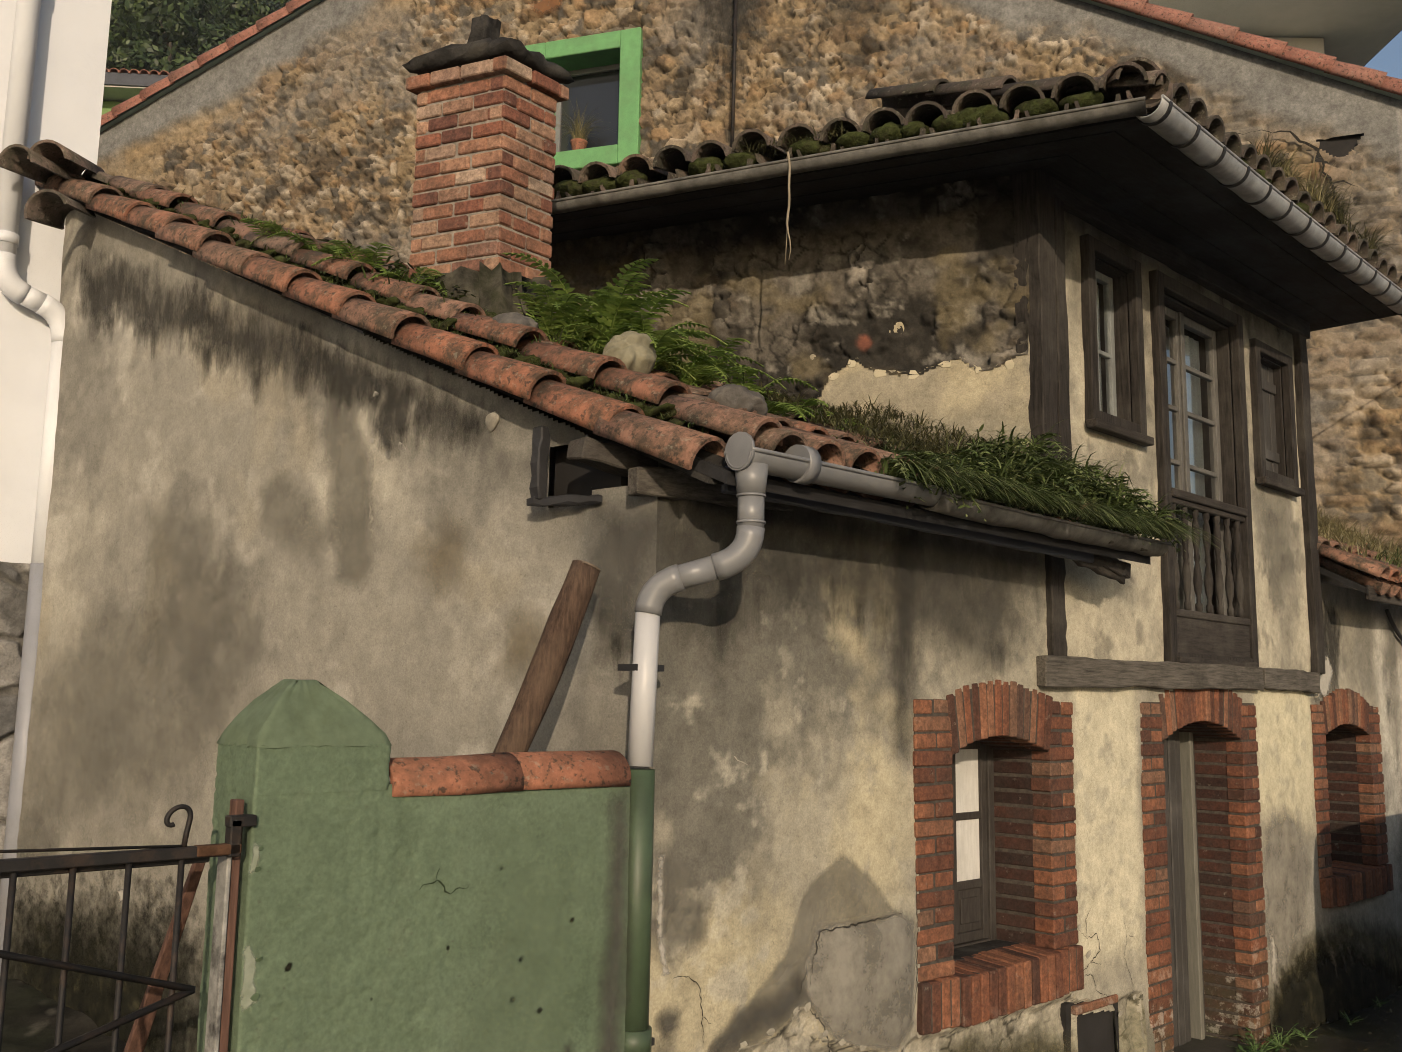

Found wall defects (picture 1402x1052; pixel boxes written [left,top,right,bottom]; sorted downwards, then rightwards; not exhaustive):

spalling [549,175,1030,407]
leakage [81,262,480,579]
crack [420,868,465,894]
crack [674,976,711,1042]
spalling [737,990,1148,1052]
leakage [1270,937,1402,1041]